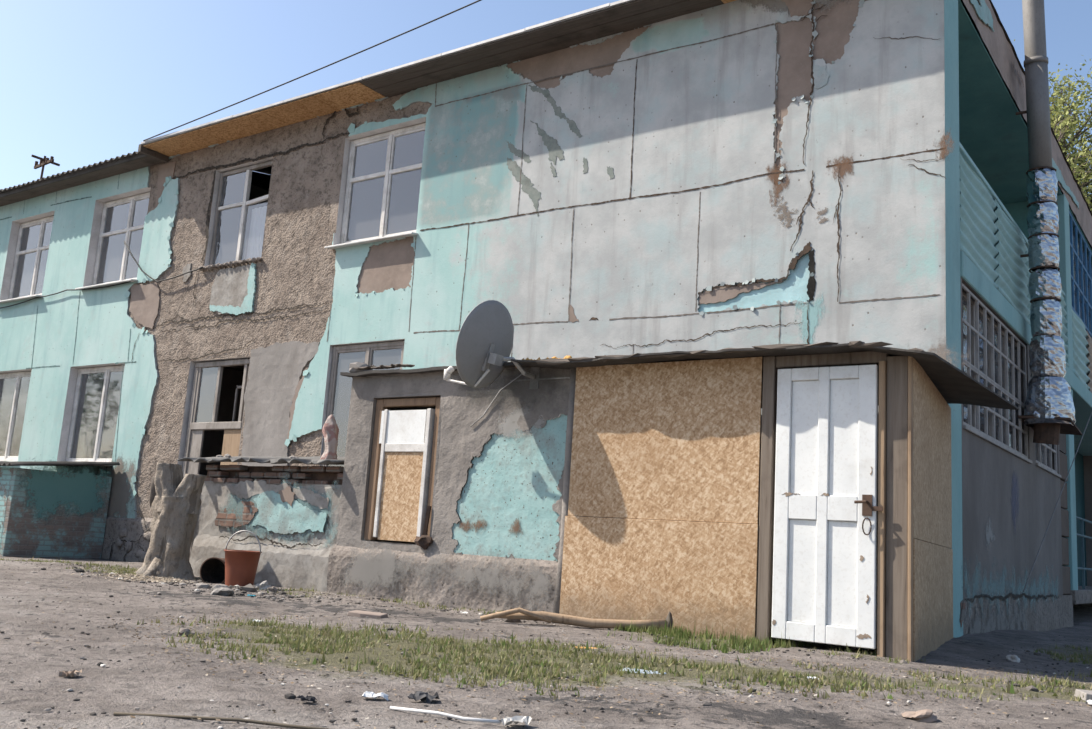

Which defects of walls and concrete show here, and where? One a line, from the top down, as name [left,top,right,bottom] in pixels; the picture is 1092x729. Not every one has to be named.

peeling [507,26,650,90]
peeling [741,0,865,185]
crack [173,106,358,178]
crack [790,0,841,302]
spalling [124,92,432,518]
crack [602,303,809,349]
peeling [698,241,816,316]
spalling [215,501,258,528]
peeling [452,407,567,561]